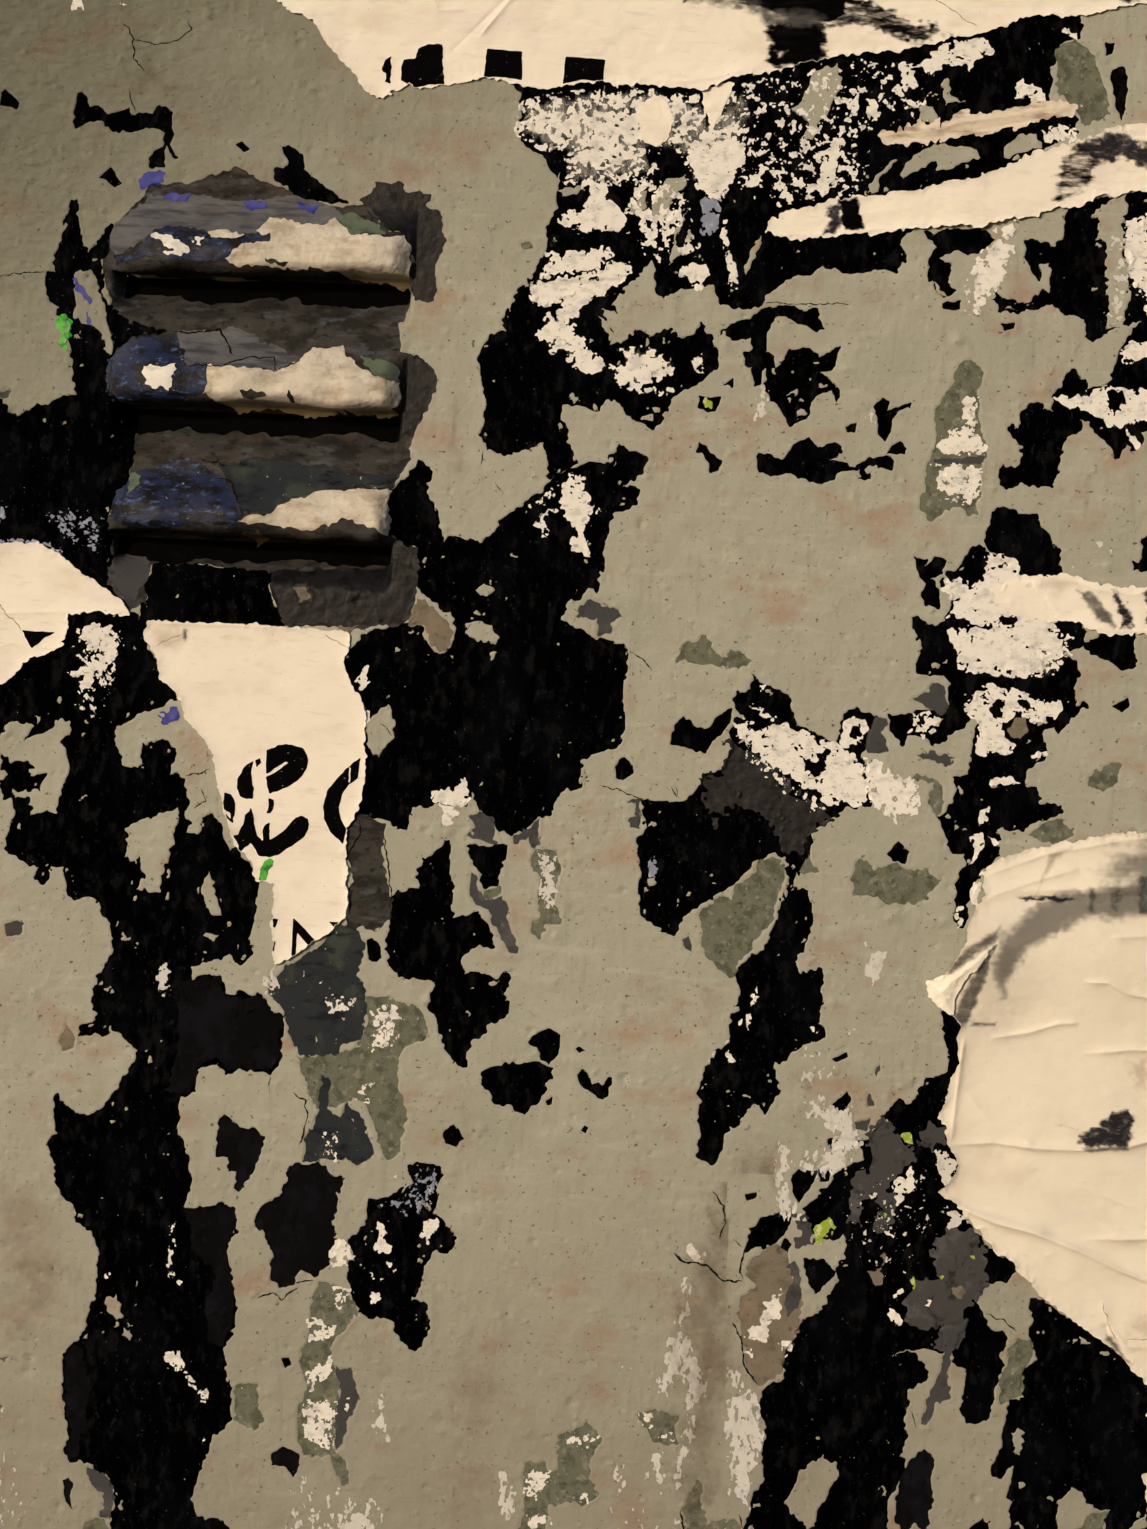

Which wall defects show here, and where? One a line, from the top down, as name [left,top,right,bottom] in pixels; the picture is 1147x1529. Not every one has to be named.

peeling [73,92,178,169]
peeling [1110,66,1128,121]
peeling [142,363,177,391]
peeling [720,305,841,427]
peeling [924,191,1147,490]
peeling [627,360,1138,1166]
peeling [481,1028,560,1115]
peeling [576,1047,612,1100]
peeling [216,1114,265,1192]
peeling [254,996,428,1288]
peeling [271,1162,457,1486]
peeling [518,1422,602,1529]